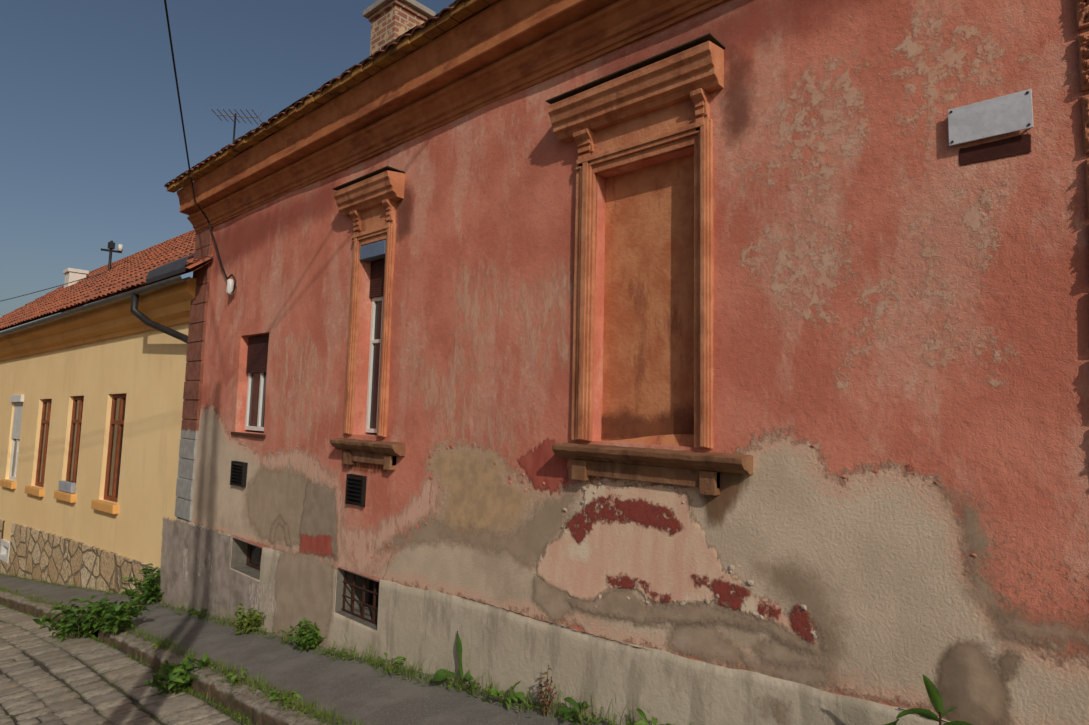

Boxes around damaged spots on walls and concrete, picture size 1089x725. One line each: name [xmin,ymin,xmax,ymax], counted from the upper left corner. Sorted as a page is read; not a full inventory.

peeling [192,402,1089,725]